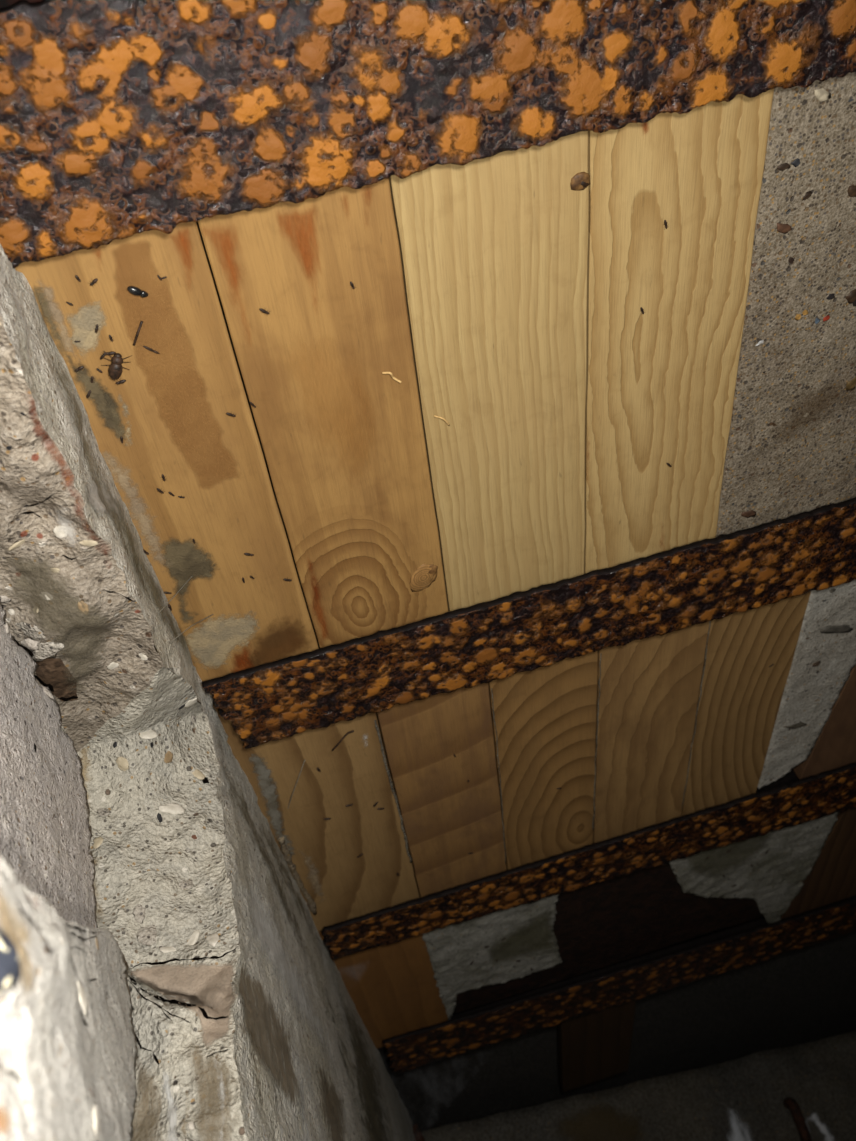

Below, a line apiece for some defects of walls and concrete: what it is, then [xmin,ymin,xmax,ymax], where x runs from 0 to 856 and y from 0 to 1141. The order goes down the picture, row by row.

corrosion [285,215,314,274]
leakage [35,288,215,646]
crack [128,947,237,1064]